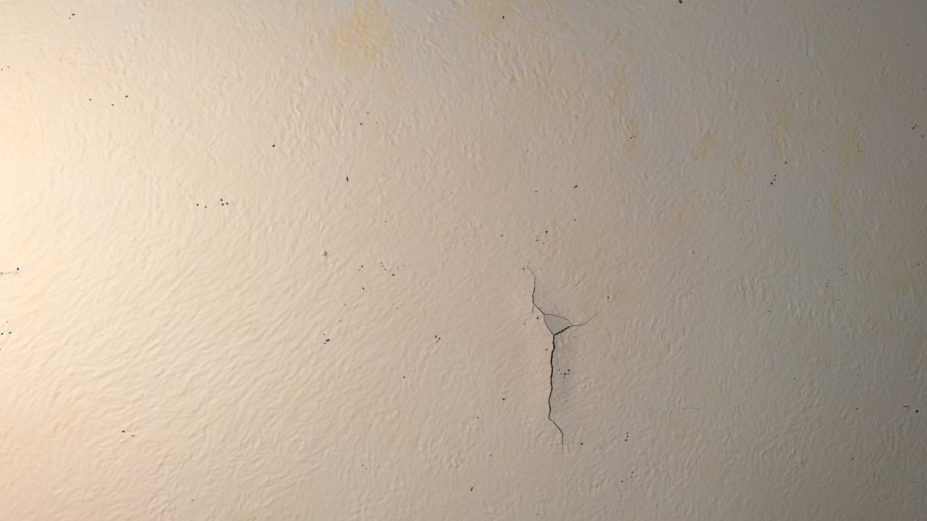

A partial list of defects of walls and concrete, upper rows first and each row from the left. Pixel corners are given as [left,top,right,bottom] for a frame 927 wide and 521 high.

crack [527,266,598,454]